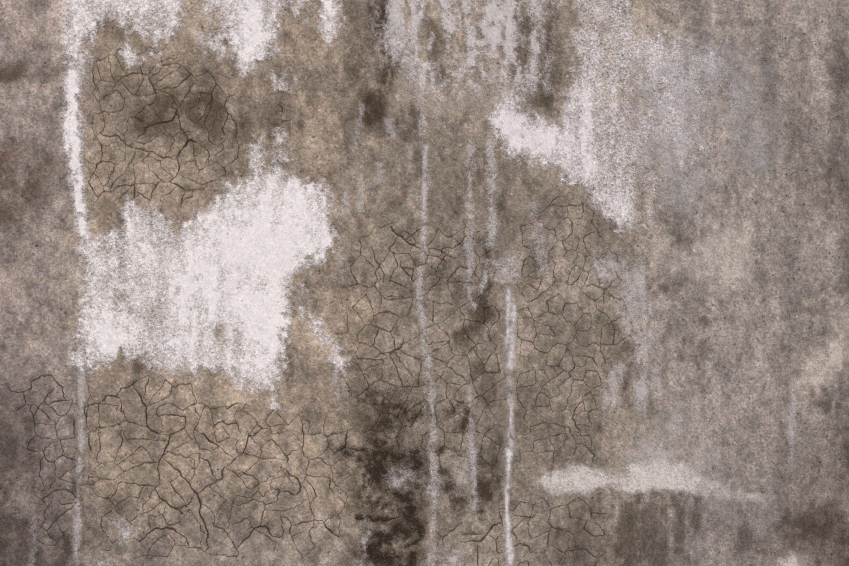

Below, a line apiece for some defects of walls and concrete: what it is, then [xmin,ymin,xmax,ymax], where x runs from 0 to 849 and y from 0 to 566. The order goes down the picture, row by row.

damp [62,70,88,237]
crack [88,48,240,204]
damp [455,241,492,343]
crack [343,198,627,486]
damp [505,290,516,369]
crack [8,374,421,566]
damp [344,438,428,566]
damp [476,401,513,565]
crack [443,498,599,566]